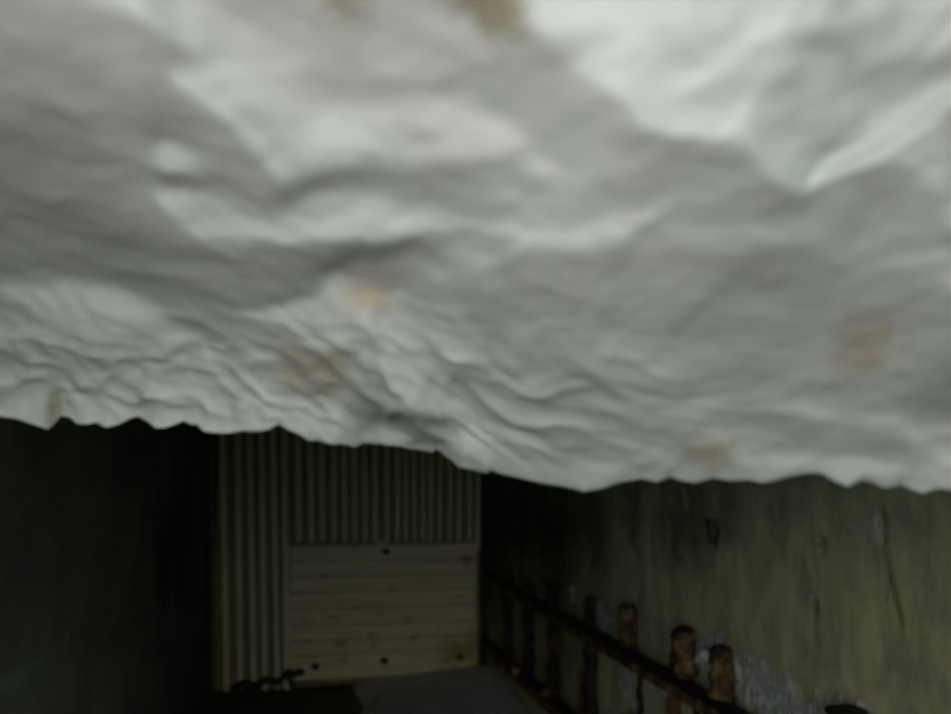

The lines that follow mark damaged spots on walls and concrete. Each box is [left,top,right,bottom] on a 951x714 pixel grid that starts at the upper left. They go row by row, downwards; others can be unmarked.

efflorescence [694,627,866,714]